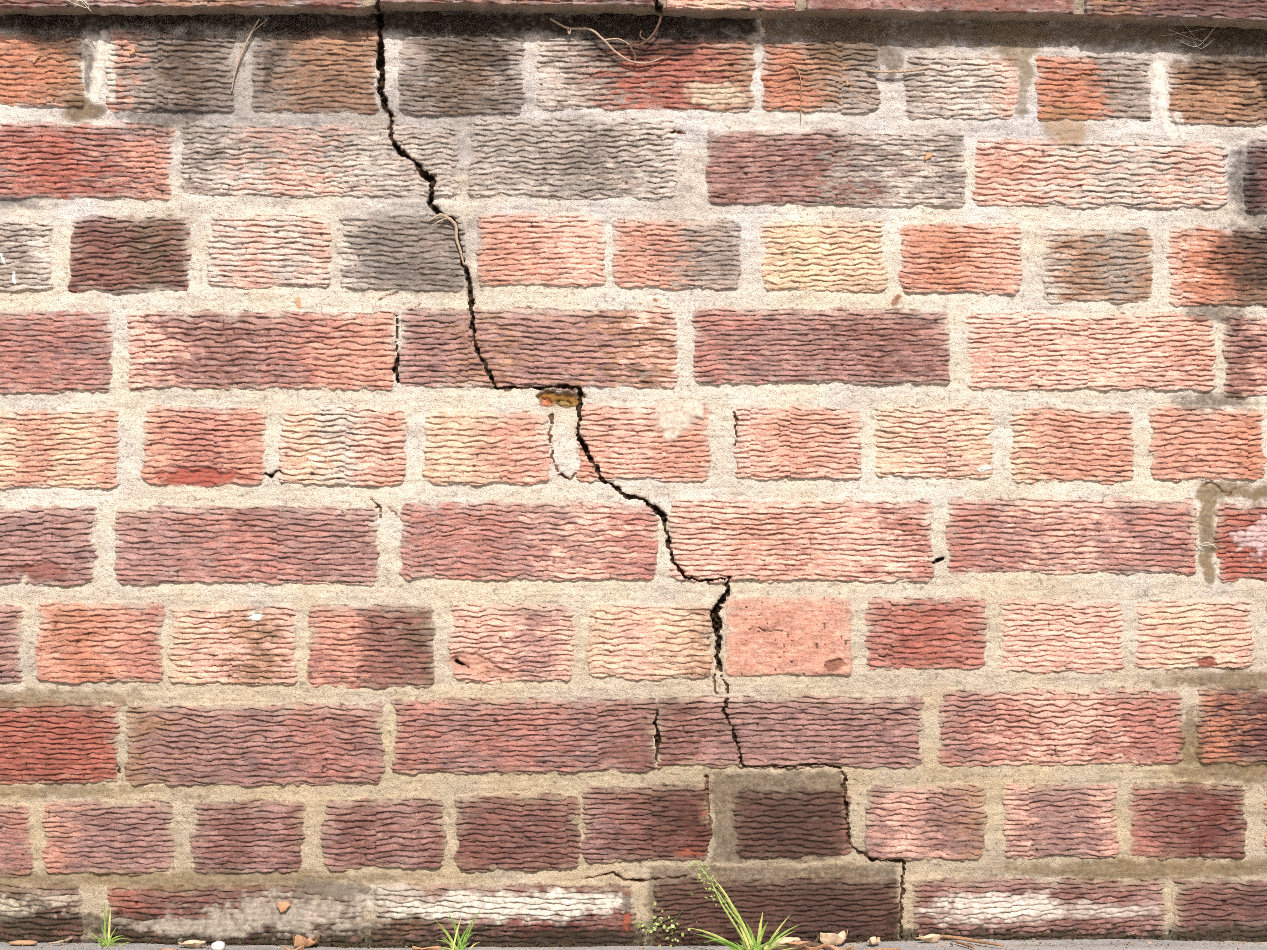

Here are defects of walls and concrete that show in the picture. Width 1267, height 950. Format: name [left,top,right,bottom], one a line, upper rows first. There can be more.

damp [0,877,627,944]
crack [370,0,906,940]